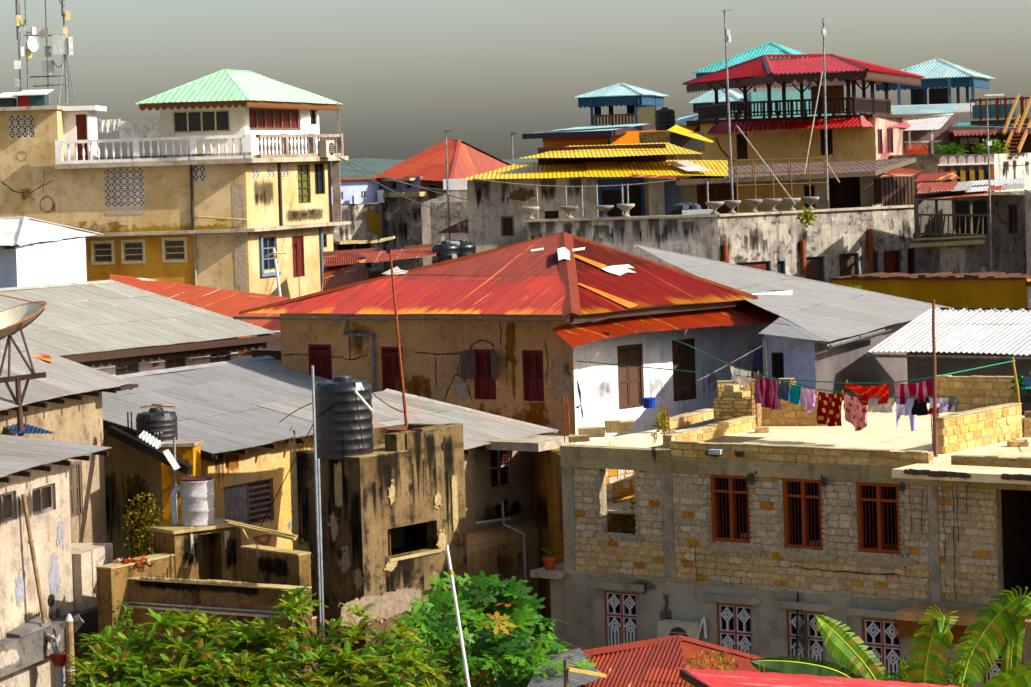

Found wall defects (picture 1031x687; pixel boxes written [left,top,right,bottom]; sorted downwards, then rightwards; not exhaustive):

damp [744,223,807,251]
damp [821,223,832,253]
damp [872,204,884,240]
corrosion [574,254,607,268]
corrosion [578,283,638,308]
damp [296,443,309,539]
damp [328,438,362,570]
damp [373,425,453,519]
spalling [327,462,421,627]
damp [385,552,424,592]